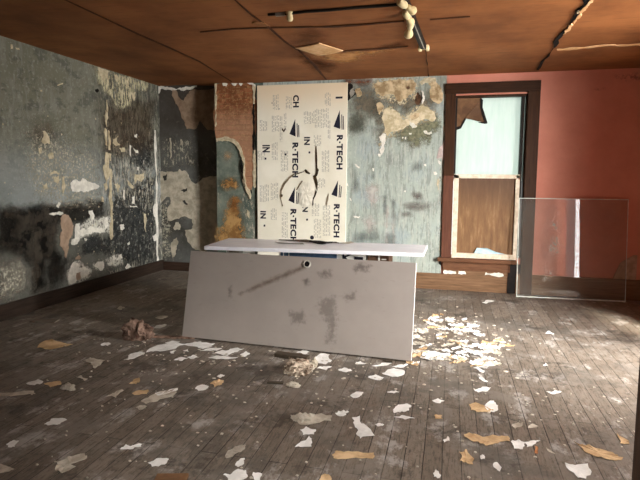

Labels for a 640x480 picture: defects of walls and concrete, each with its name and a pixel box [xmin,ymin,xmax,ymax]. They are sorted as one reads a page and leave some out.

crack [536,0,593,70]
spalling [372,77,443,157]
spalling [26,66,220,261]
spalling [158,83,257,238]
peeling [0,260,27,297]
water stain [31,227,67,293]
water stain [66,206,103,224]
water stain [82,236,110,255]
peeling [66,254,131,285]
water stain [136,182,146,223]